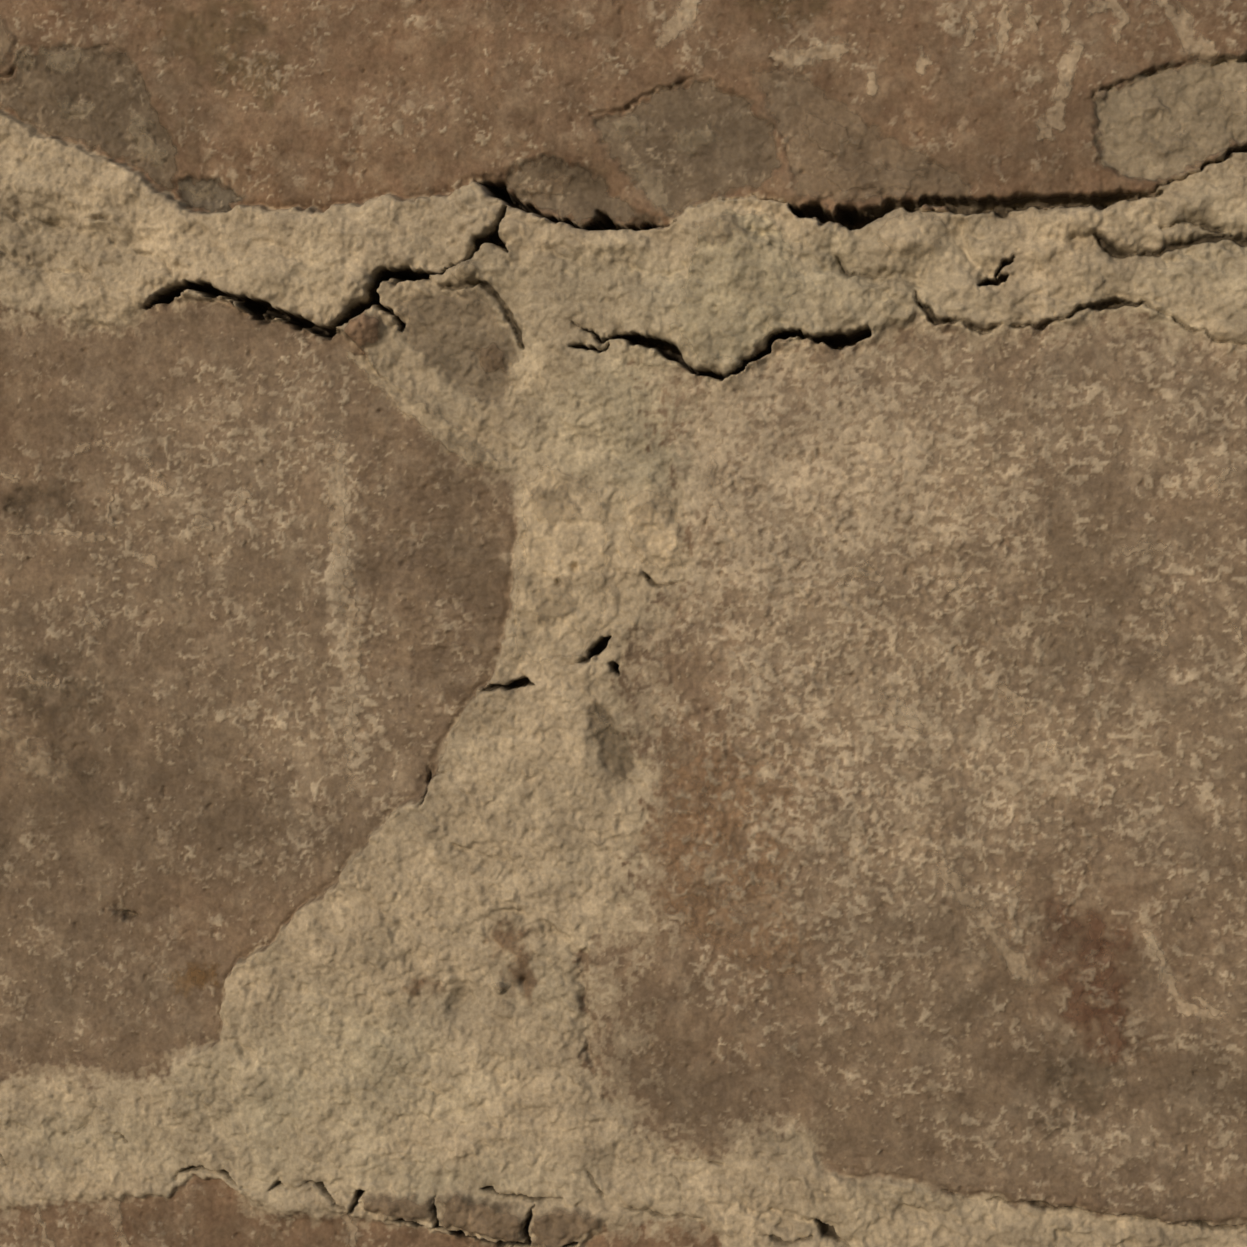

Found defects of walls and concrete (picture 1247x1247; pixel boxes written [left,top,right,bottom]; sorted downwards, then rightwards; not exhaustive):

crack [1201,146,1247,171]
crack [789,191,1247,259]
crack [148,183,665,341]
crack [978,258,1013,286]
crack [916,298,1144,334]
crack [572,325,872,381]
crack [583,636,620,675]
crack [481,677,535,691]
crack [184,1166,231,1177]
crack [317,1181,365,1213]
crack [397,1186,544,1245]
crack [817,1219,841,1241]